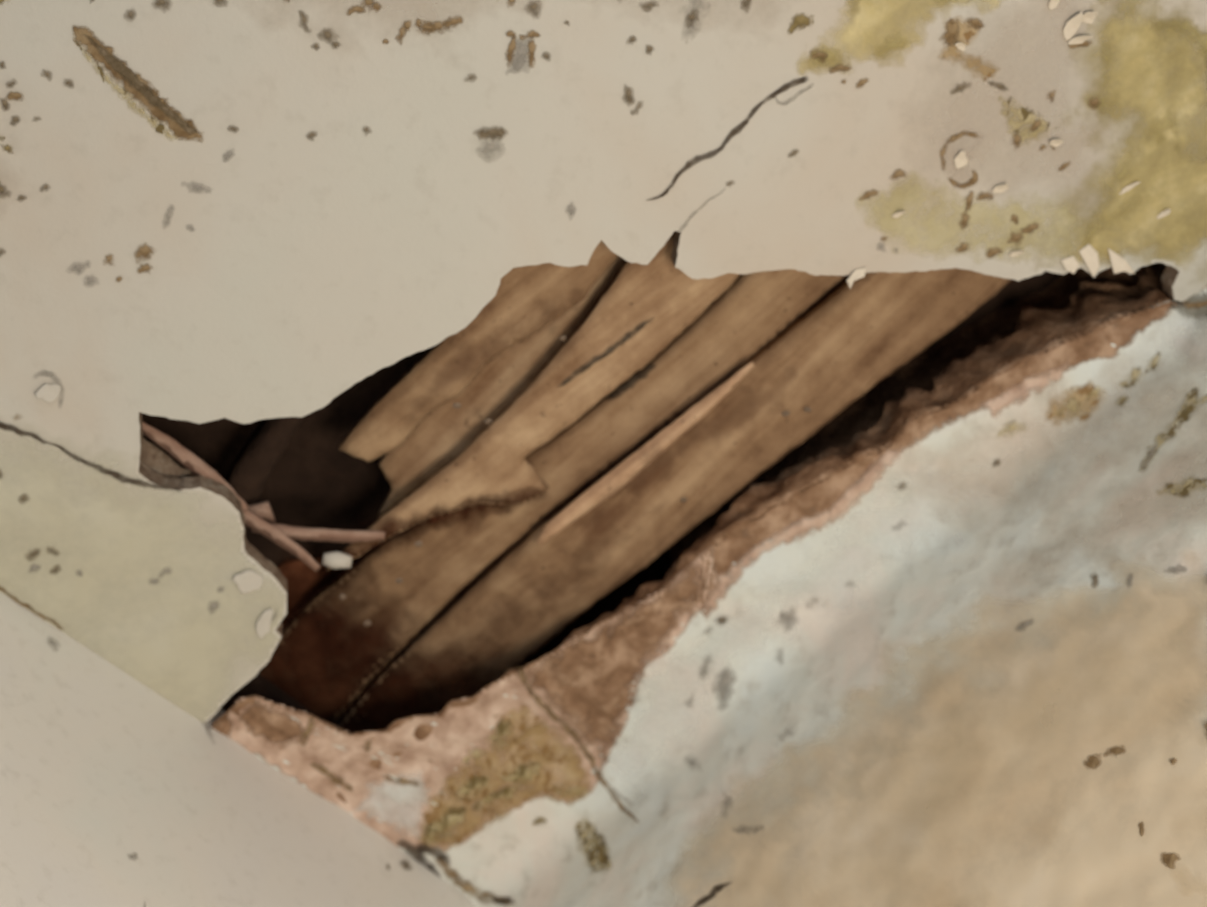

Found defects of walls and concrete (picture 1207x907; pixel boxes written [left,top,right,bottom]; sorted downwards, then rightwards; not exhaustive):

spalling [73,26,202,140]
damp [801,0,965,87]
crack [650,77,811,200]
damp [860,0,1207,260]
peeling [135,245,153,273]
peeling [846,267,866,289]
peeling [1061,244,1135,277]
peeling [28,549,59,573]
peeling [210,570,263,610]
flaking render [228,298,1173,869]
damp [674,567,1207,907]
crack [400,841,512,905]